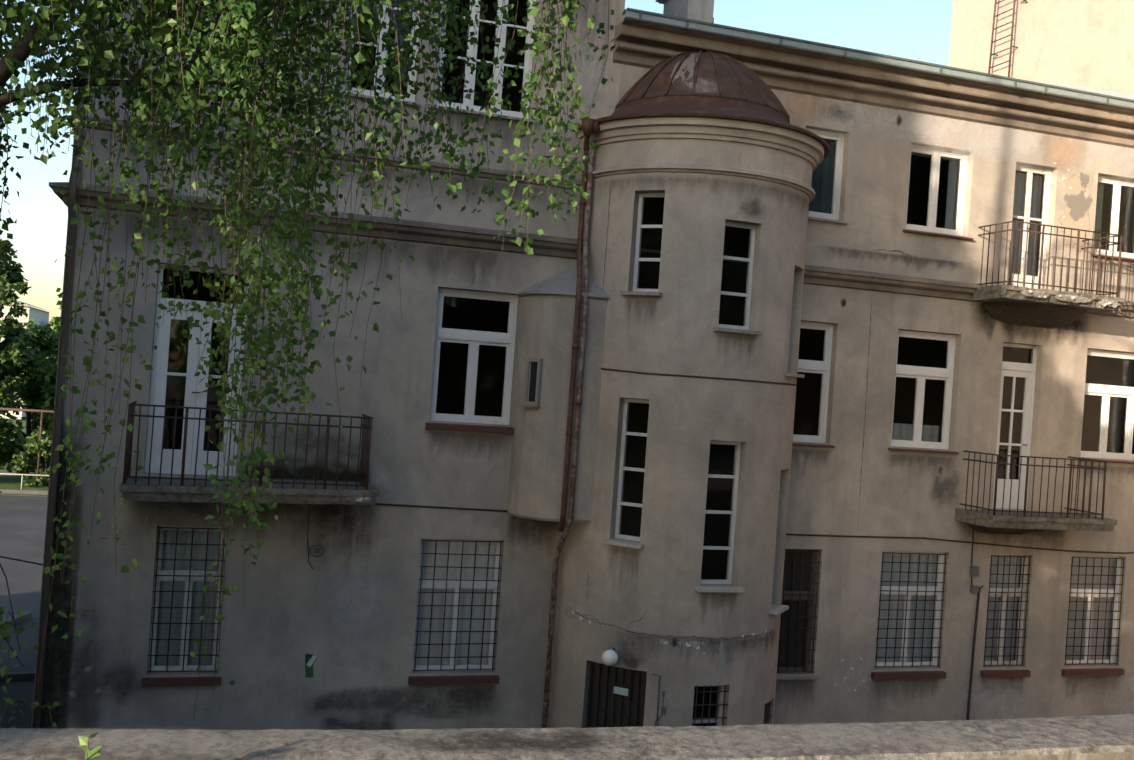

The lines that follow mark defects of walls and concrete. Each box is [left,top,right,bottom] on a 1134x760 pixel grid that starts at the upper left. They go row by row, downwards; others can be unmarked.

peeling [1059,175,1090,252]
spalling [1021,290,1120,308]